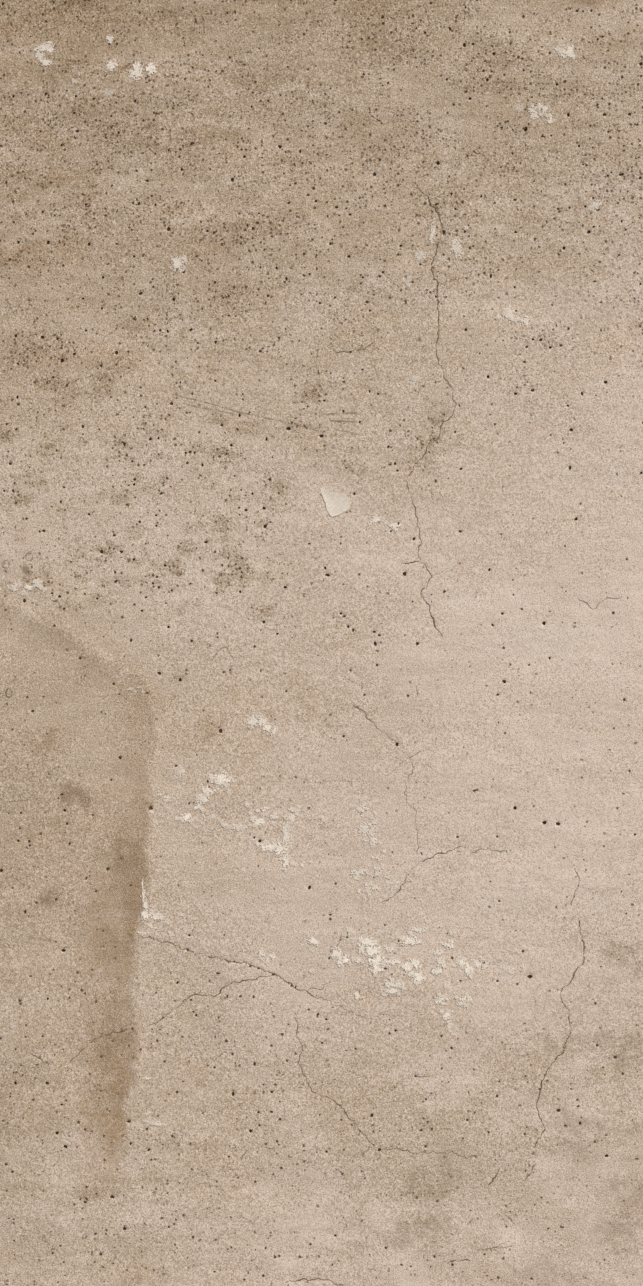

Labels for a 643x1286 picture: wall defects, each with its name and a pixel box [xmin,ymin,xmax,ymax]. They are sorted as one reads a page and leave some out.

crack [406,185,457,637]
crack [353,705,507,902]
crack [30,1029,129,1065]
crack [148,871,585,1185]